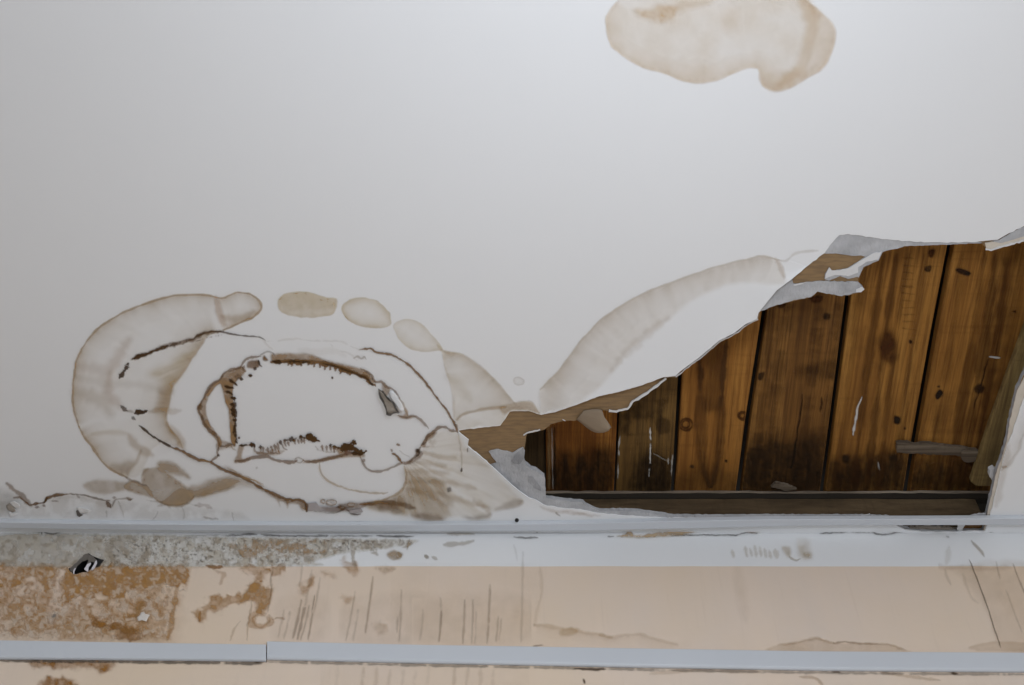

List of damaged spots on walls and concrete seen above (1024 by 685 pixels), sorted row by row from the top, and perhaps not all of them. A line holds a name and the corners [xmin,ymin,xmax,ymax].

water stain [72,292,457,513]
hole [70,554,104,574]